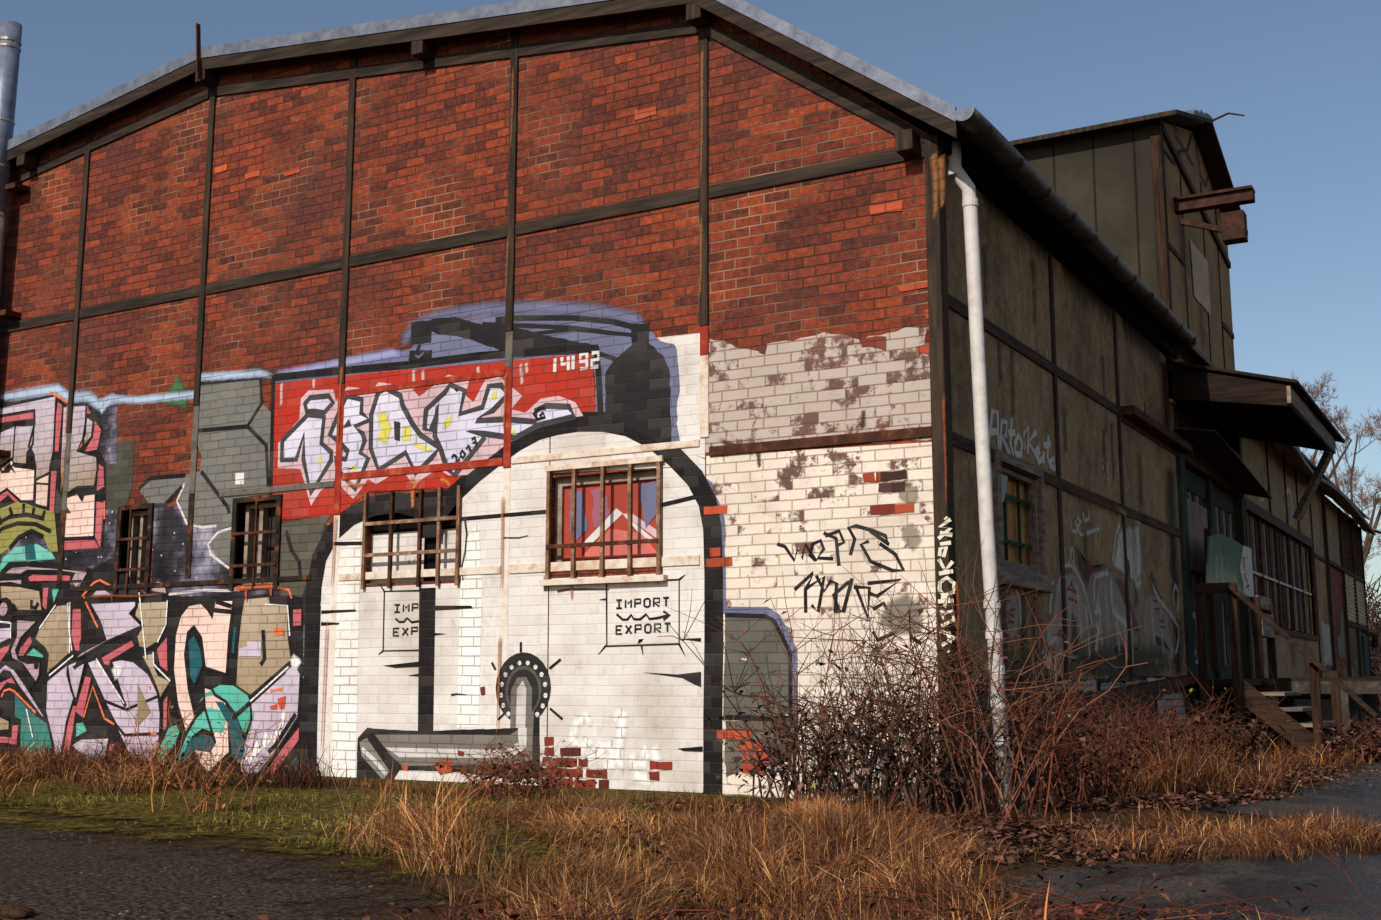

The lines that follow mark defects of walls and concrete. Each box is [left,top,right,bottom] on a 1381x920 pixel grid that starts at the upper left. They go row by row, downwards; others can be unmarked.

peeling [859,336,886,350]
peeling [916,310,929,353]
spalling [863,470,914,515]
peeling [704,505,727,515]
peeling [706,547,732,567]
peeling [433,750,464,775]
peeling [539,737,609,789]
peeling [649,761,672,781]
peeling [717,730,778,774]